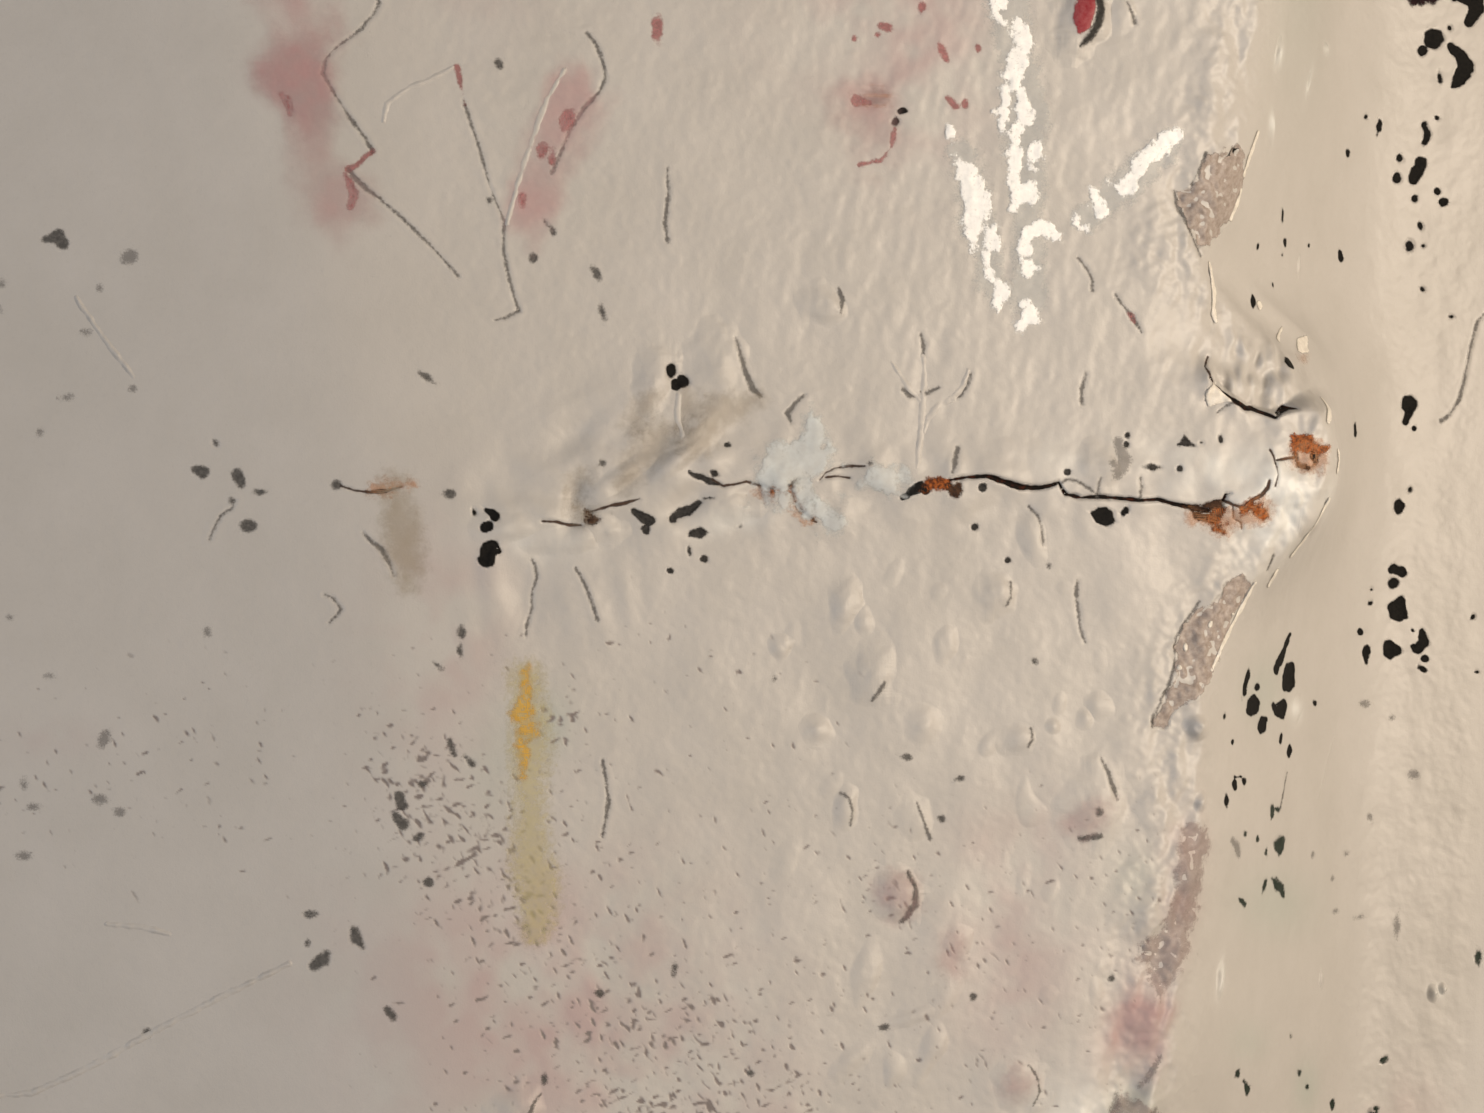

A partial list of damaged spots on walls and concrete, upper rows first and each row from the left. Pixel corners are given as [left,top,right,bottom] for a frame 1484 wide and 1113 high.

peeling [1174,130,1260,323]
crack [711,465,865,523]
rust [900,476,963,500]
crack [949,356,1296,529]
rust [1189,497,1269,535]
rust [1289,432,1330,470]
peeling [1151,497,1331,728]
peeling [1243,633,1295,758]